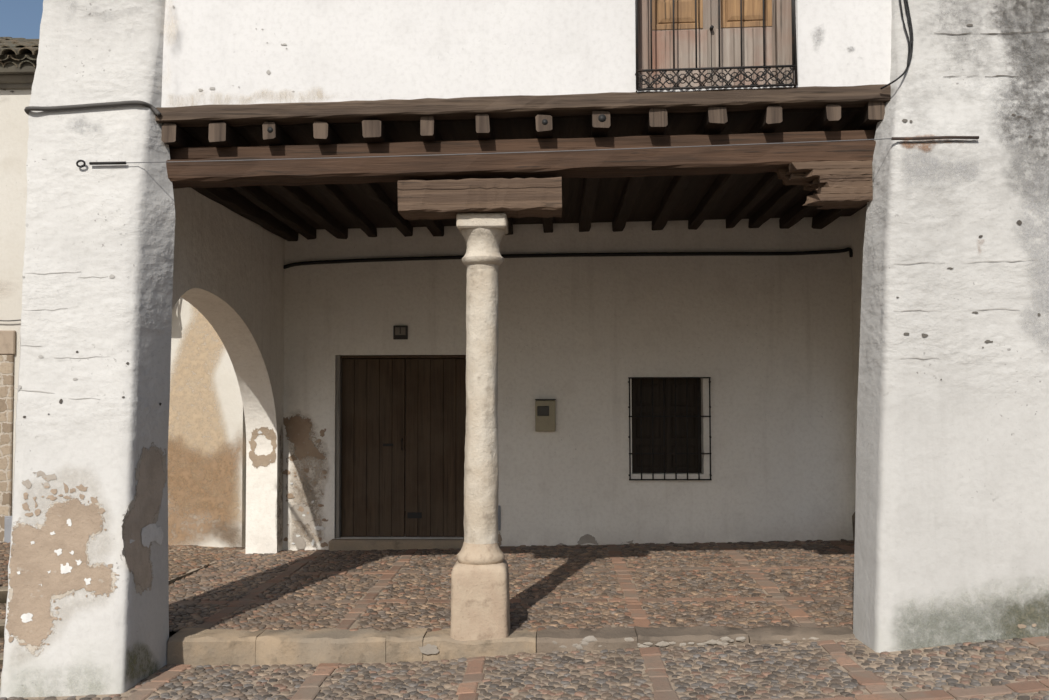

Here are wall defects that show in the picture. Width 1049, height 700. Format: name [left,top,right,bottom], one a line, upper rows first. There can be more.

water stain [991,0,1049,341]
flaking render [5,442,168,657]
flaking render [248,414,328,550]